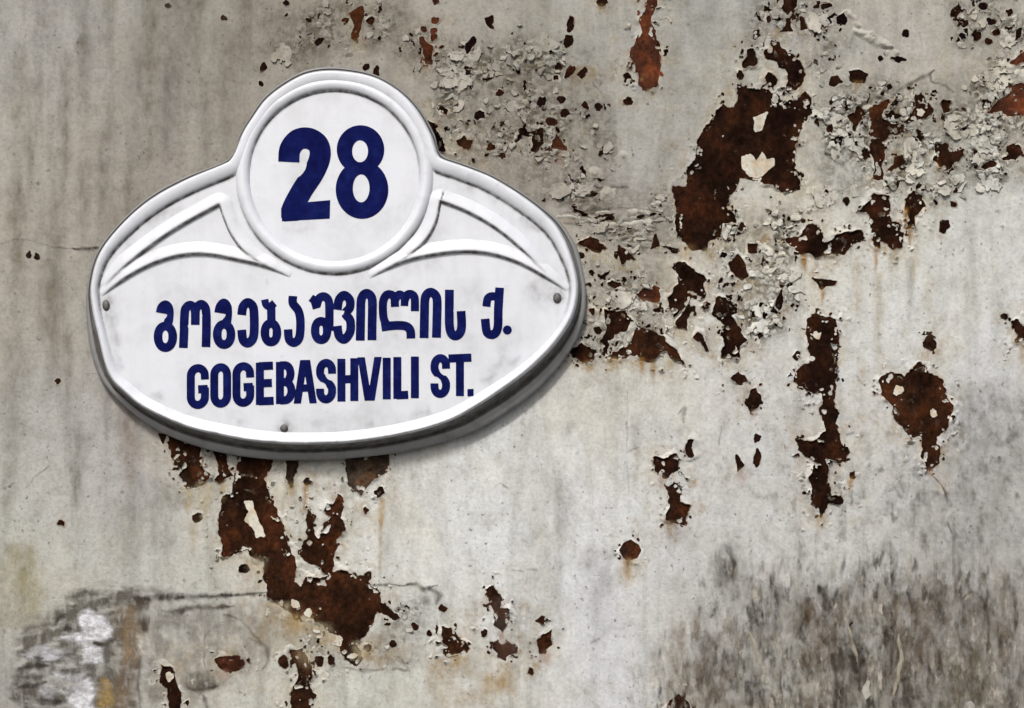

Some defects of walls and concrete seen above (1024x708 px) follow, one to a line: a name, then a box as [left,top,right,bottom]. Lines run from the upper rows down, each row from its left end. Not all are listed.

peeling [256,0,352,88]
peeling [362,0,679,367]
rust [614,0,675,105]
rust [562,27,1024,532]
peeling [751,0,1024,234]
rust [146,429,410,708]
rust [427,571,566,681]
rust [604,430,703,576]